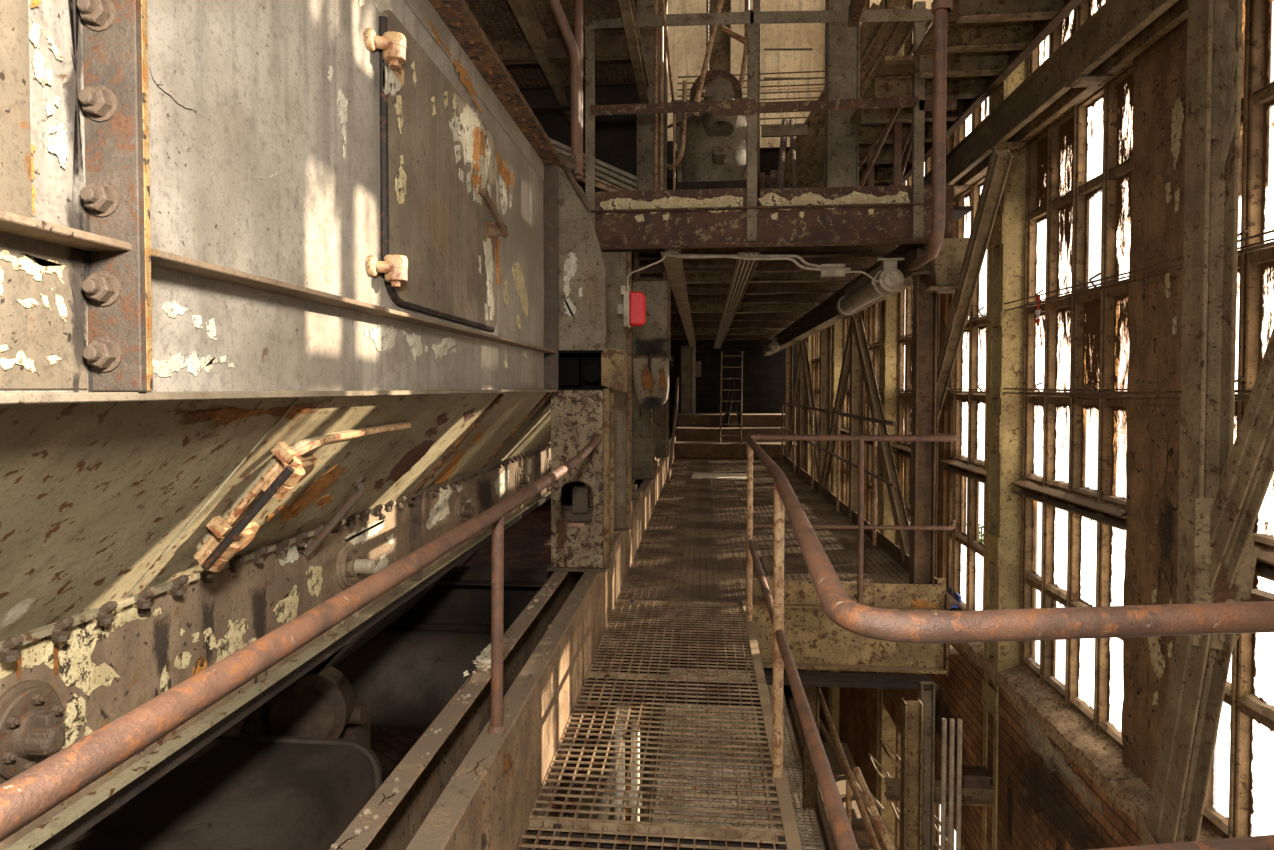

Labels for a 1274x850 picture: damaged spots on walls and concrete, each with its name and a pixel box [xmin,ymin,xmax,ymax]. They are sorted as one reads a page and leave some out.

peeling [29,18,68,169]
corrosion [428,19,515,195]
peeling [600,195,743,222]
peeling [758,191,910,220]
peeling [0,250,67,322]
peeling [0,345,61,373]
corrosion [184,402,316,428]
corrosion [267,464,345,524]
corrosion [1212,568,1238,603]
corrosion [16,636,59,679]
peeling [0,603,162,751]
peeling [160,619,256,694]